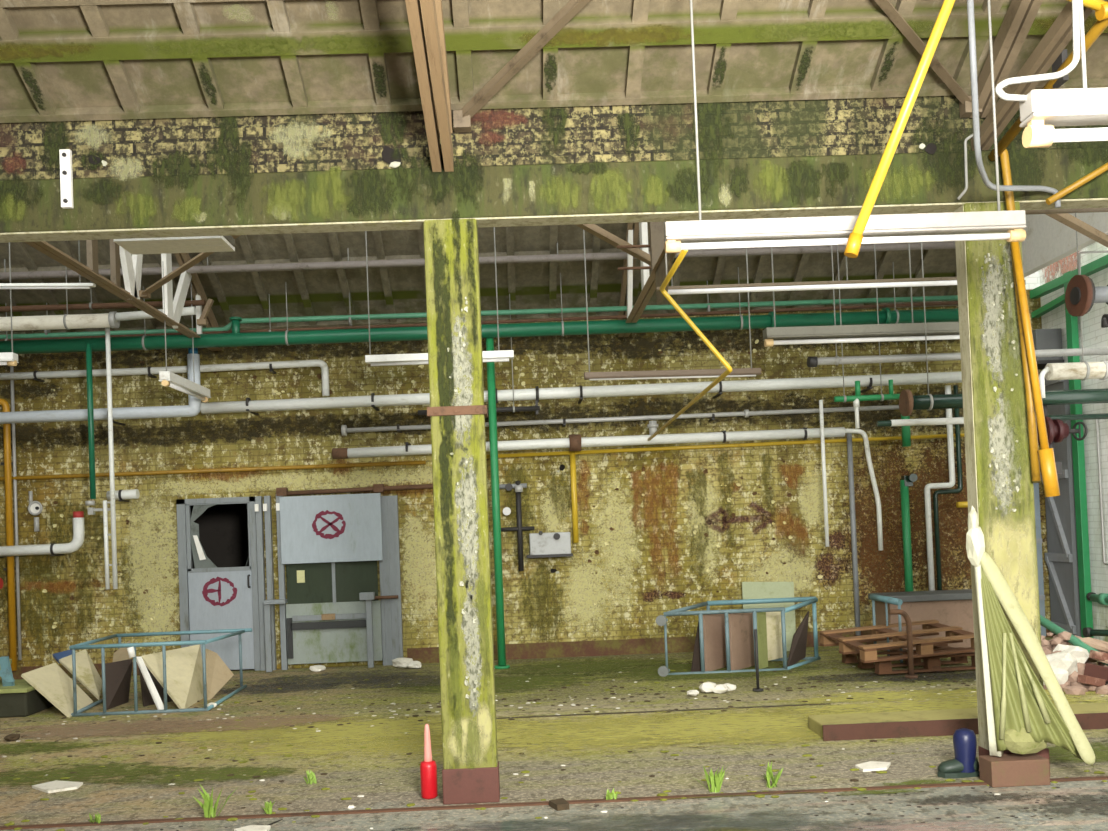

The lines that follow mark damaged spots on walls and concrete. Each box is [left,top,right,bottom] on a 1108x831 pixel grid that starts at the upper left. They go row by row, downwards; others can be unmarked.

damp [206,116,253,200]
damp [273,125,330,158]
damp [268,167,346,220]
damp [529,107,631,213]
damp [617,113,640,156]
damp [646,102,785,206]
damp [1001,253,1026,485]
damp [977,350,989,508]
damp [0,210,964,767]
rust [631,463,679,583]
rust [771,507,809,557]
damp [455,810,895,831]